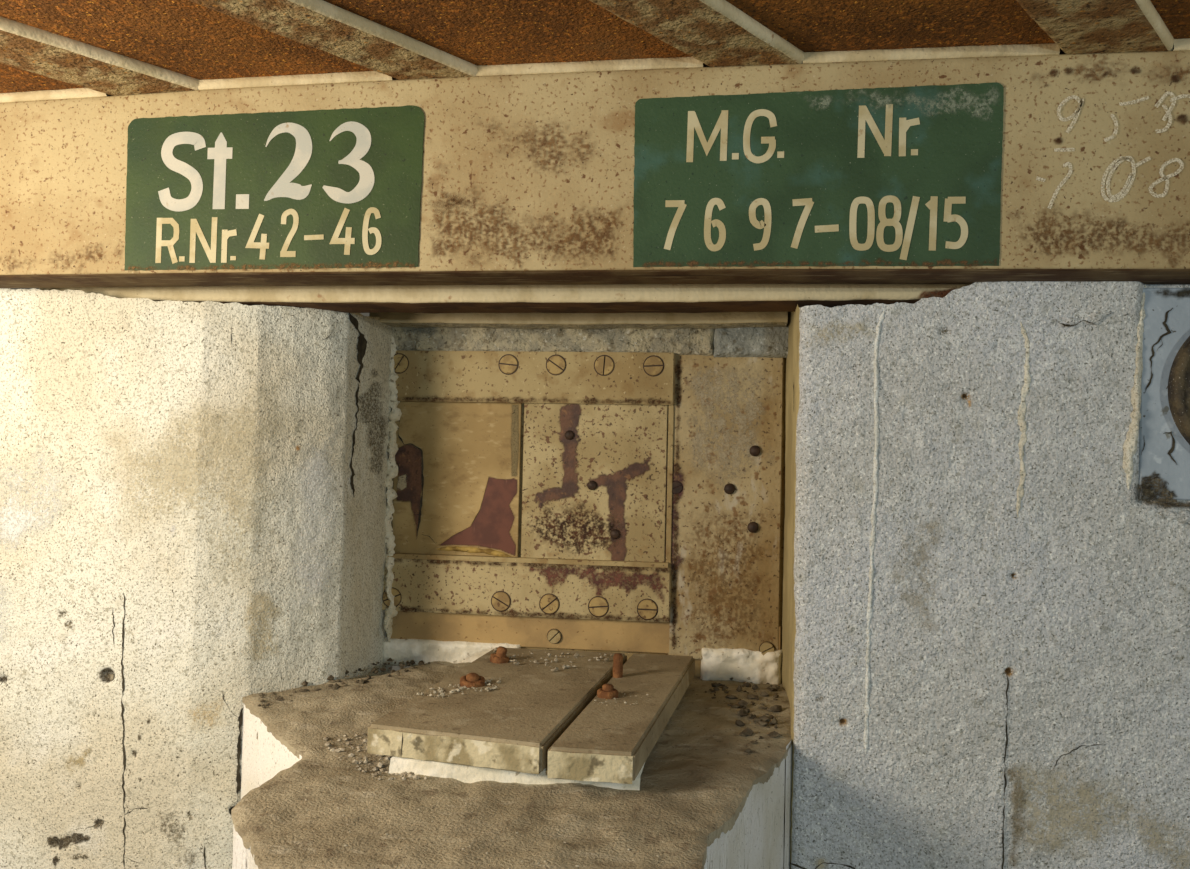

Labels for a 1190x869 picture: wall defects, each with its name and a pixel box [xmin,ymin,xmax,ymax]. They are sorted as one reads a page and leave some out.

corrosion [534,404,651,561]
crack [112,593,150,868]
crack [790,861,855,869]
crack [1001,677,1009,869]